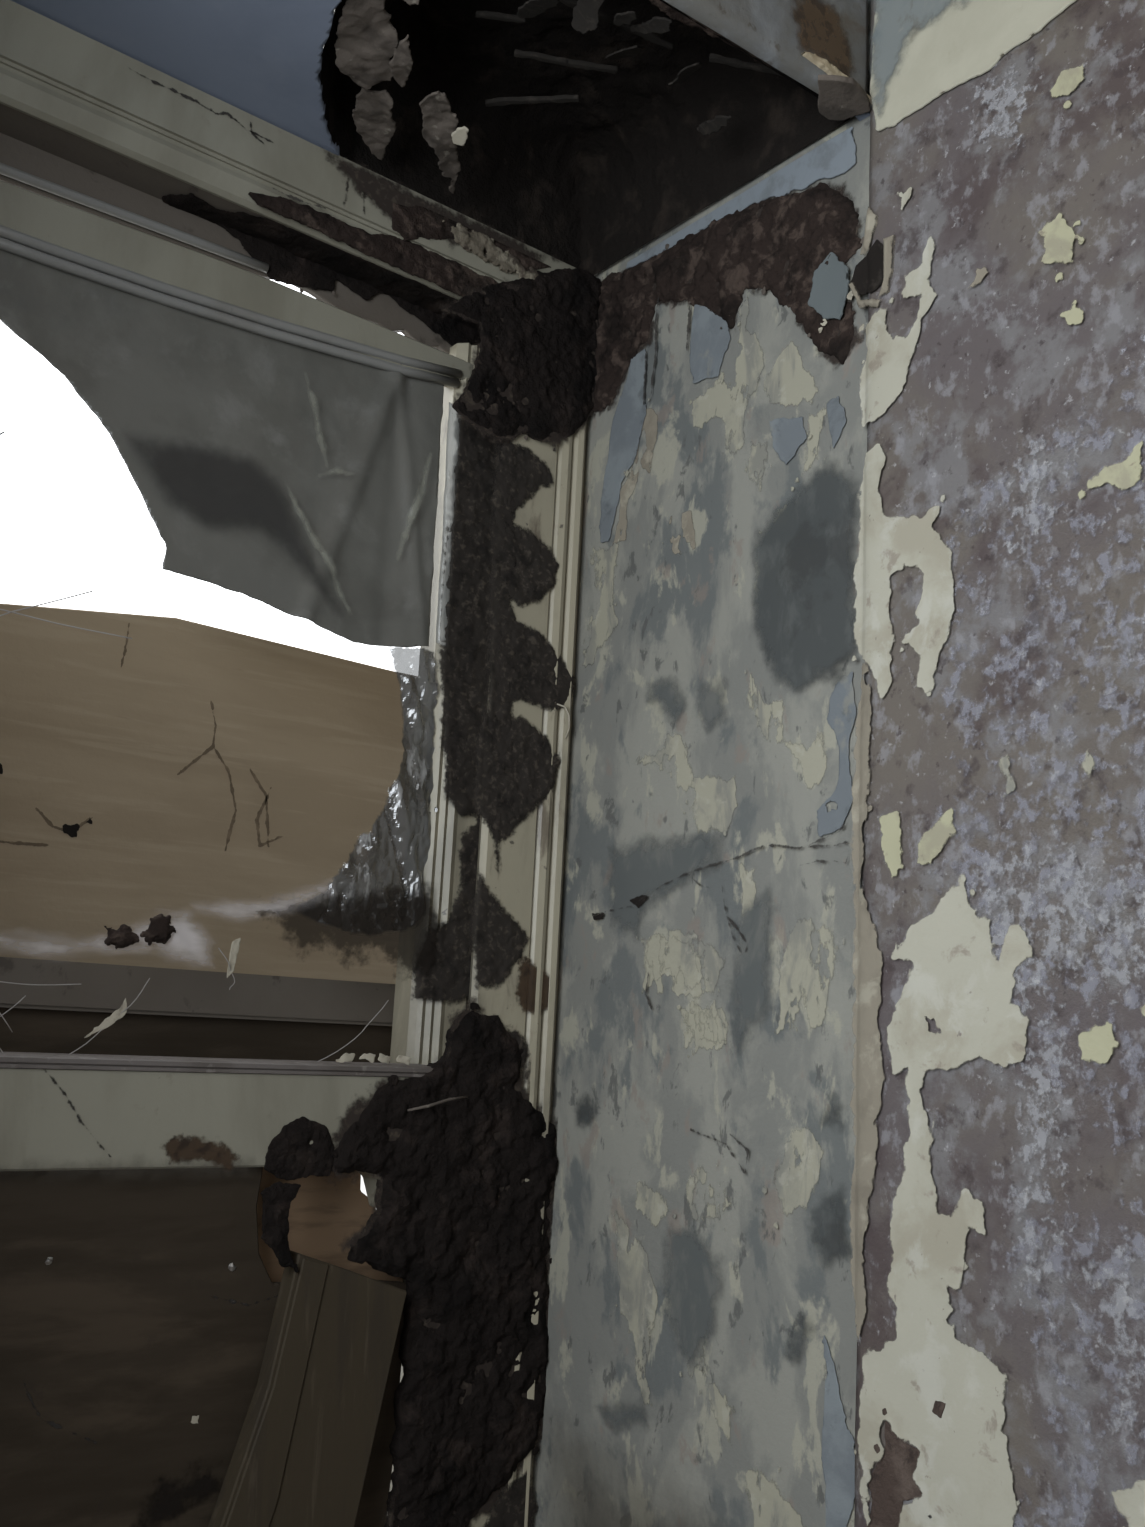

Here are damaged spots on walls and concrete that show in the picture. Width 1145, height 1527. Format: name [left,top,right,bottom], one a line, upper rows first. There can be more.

flaking render [334,0,413,161]
flaking render [419,91,469,194]
peeling [626,0,1076,269]
peeling [1050,65,1084,108]
peeling [1038,213,1084,283]
peeling [689,207,937,491]
peeling [583,349,658,667]
damp [753,469,856,690]
peeling [1078,441,1143,500]
peeling [744,443,1032,1527]
peeling [1078,1022,1119,1064]
peeling [1111,1480,1145,1527]